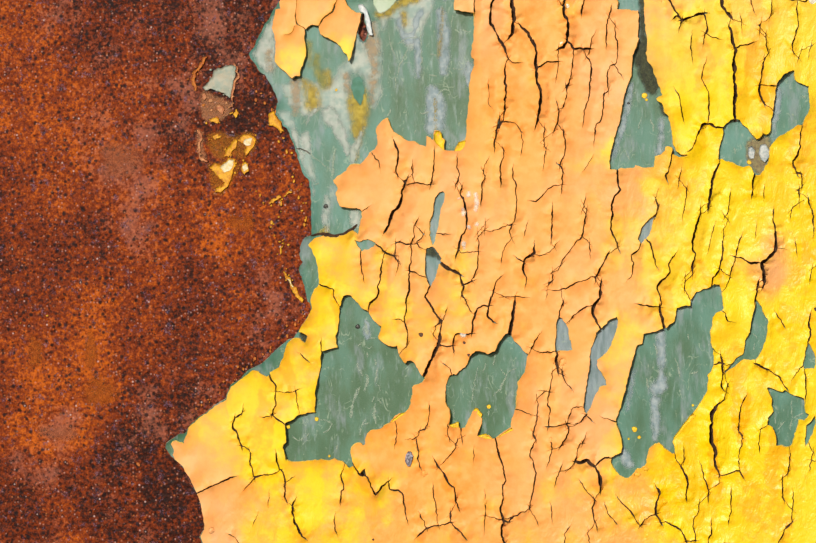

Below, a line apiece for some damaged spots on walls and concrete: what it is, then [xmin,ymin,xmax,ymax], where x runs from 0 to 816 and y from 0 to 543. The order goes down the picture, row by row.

corrosion [0,0,312,543]
corrosion [291,43,331,112]
peeling [251,0,474,303]
crack [360,0,815,377]
crack [197,410,305,538]
peeling [283,295,425,468]
crack [334,406,475,539]
peeling [445,333,528,439]
crack [484,335,766,543]
peeling [611,284,724,478]
peeling [767,387,816,447]
crack [778,444,815,543]